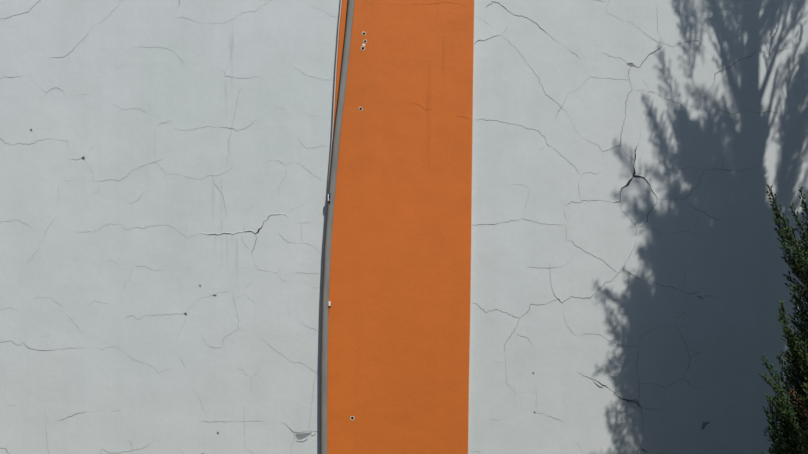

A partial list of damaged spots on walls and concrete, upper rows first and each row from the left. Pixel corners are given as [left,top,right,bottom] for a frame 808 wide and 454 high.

crack [189,205,312,251]
crack [459,0,768,421]